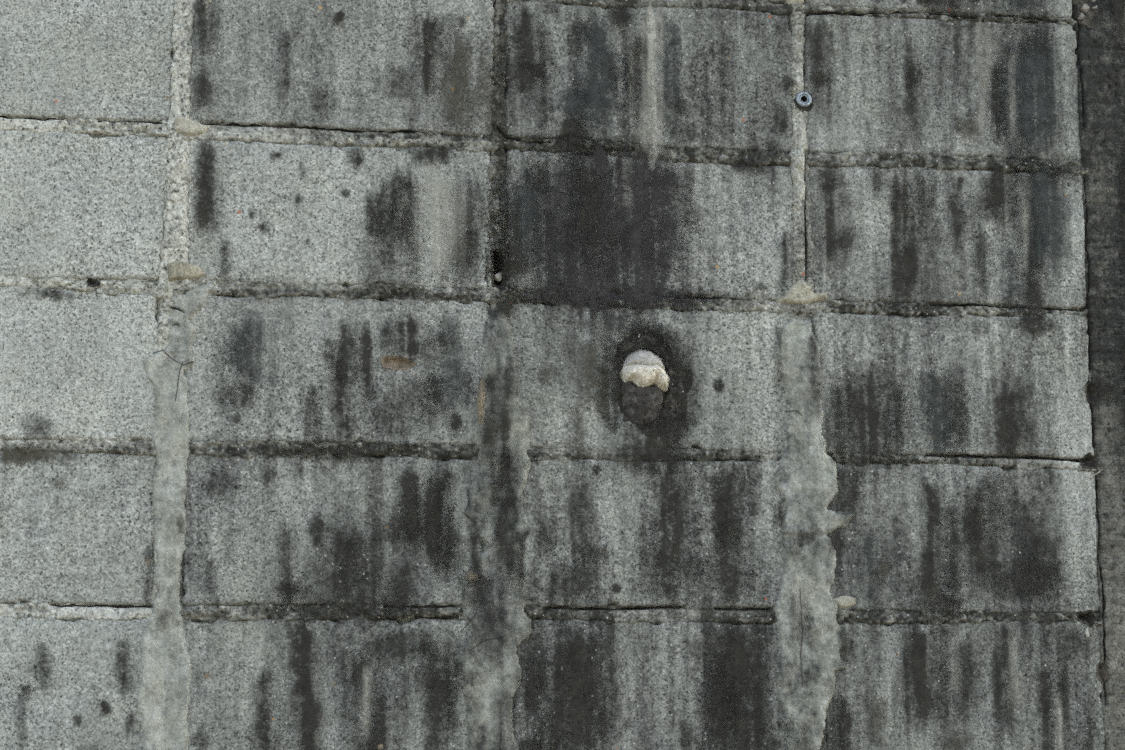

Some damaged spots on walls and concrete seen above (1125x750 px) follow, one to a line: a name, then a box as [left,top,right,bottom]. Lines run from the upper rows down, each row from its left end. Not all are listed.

leakage [195,143,214,228]
leakage [366,171,486,290]
leakage [818,163,855,261]
leakage [873,169,934,309]
leakage [503,4,703,615]
leakage [325,313,473,461]
spalling [615,330,693,437]
leakage [810,336,901,465]
leakage [379,356,524,663]
leakage [919,476,1057,613]
leakage [288,623,323,750]
leakage [1037,631,1087,750]